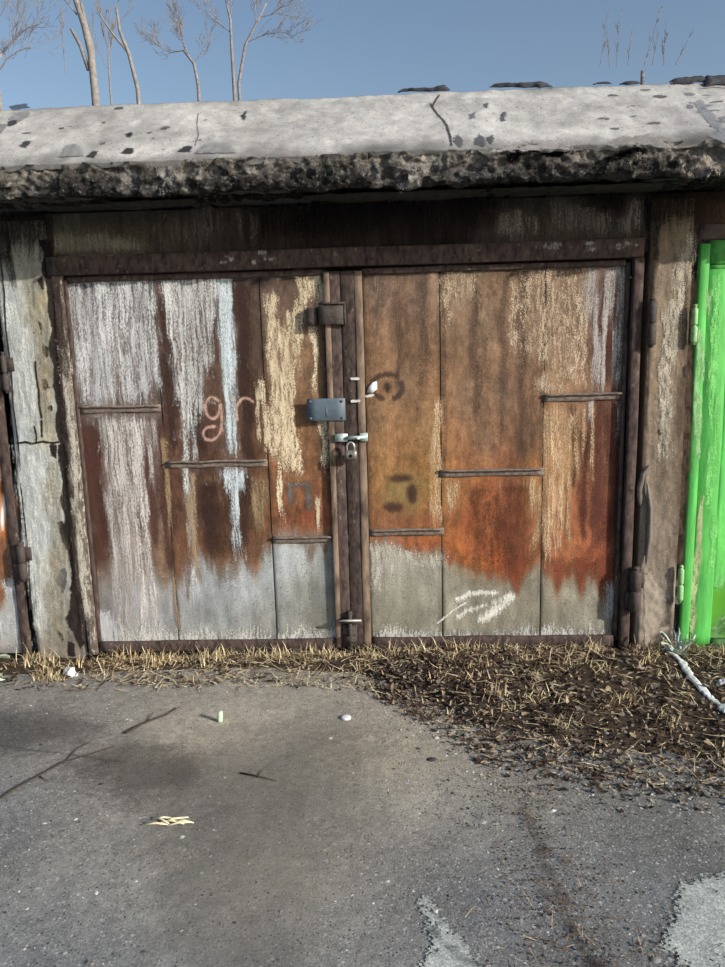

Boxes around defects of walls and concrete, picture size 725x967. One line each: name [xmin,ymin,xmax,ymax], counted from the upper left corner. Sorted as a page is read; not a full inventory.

crack [429,95,453,146]
spalling [115,132,177,196]
spalling [397,164,425,191]
spalling [556,150,584,174]
spalling [628,147,657,169]
peeling [254,269,324,524]
rust [51,275,333,599]
peeling [317,421,330,478]
rust [363,267,623,602]
rust [0,525,14,607]
rust [67,512,85,631]
peeling [105,619,336,641]